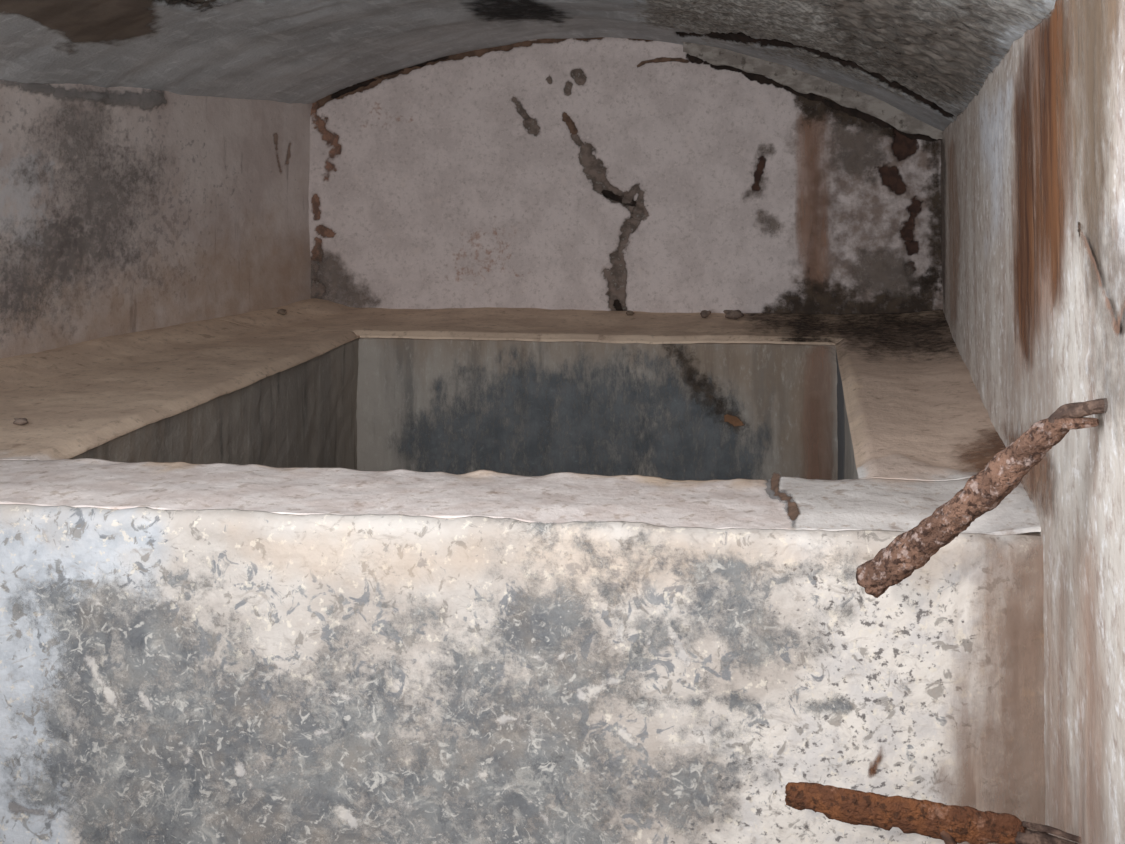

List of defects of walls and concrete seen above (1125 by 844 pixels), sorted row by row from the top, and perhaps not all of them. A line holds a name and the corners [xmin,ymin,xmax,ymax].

water stain [0,100,164,318]
flaking render [158,0,216,11]
crack [562,112,649,311]
crack [317,32,953,142]
water stain [794,94,895,181]
water stain [749,139,958,357]
corrosion [1014,0,1072,359]
water stain [400,352,768,481]
corrosion [856,398,1108,598]
corrosion [785,542,1082,844]
water stain [8,802,53,818]